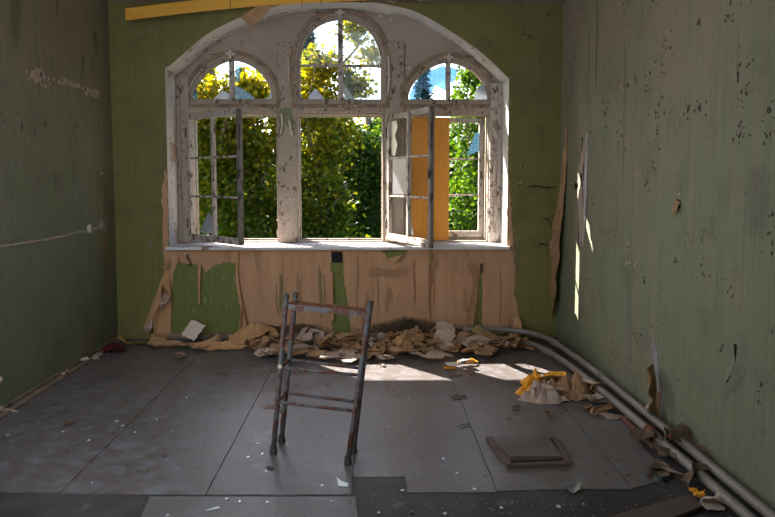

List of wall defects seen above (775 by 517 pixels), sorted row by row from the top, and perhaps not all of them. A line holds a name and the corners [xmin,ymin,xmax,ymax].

spalling [26,68,102,99]
peeling [143,257,171,339]
spalling [330,252,345,322]
peeling [381,250,406,263]
peeling [549,127,592,317]